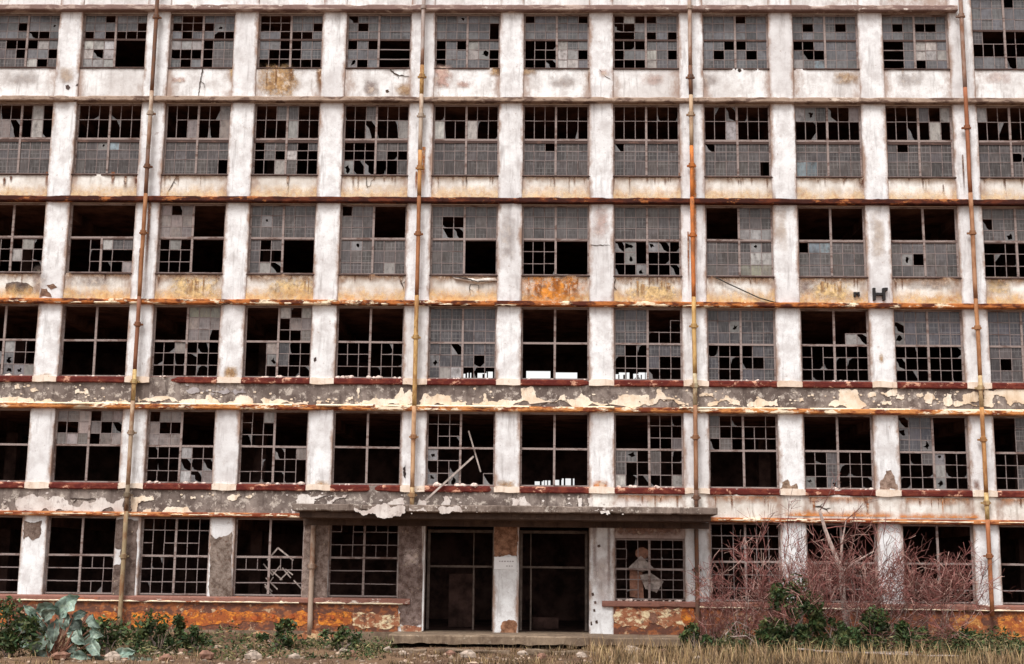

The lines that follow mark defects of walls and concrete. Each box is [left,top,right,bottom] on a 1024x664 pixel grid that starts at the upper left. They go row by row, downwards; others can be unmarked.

rust [259,65,298,96]
spalling [5,282,56,297]
rust [524,276,587,301]
peeling [0,383,55,402]
peeling [68,384,1024,409]
spalling [880,470,898,490]
peeling [286,492,347,513]
peeling [354,495,477,519]
peeling [511,496,544,506]
peeling [568,494,648,515]
spalling [0,492,214,596]
peeling [131,525,422,641]